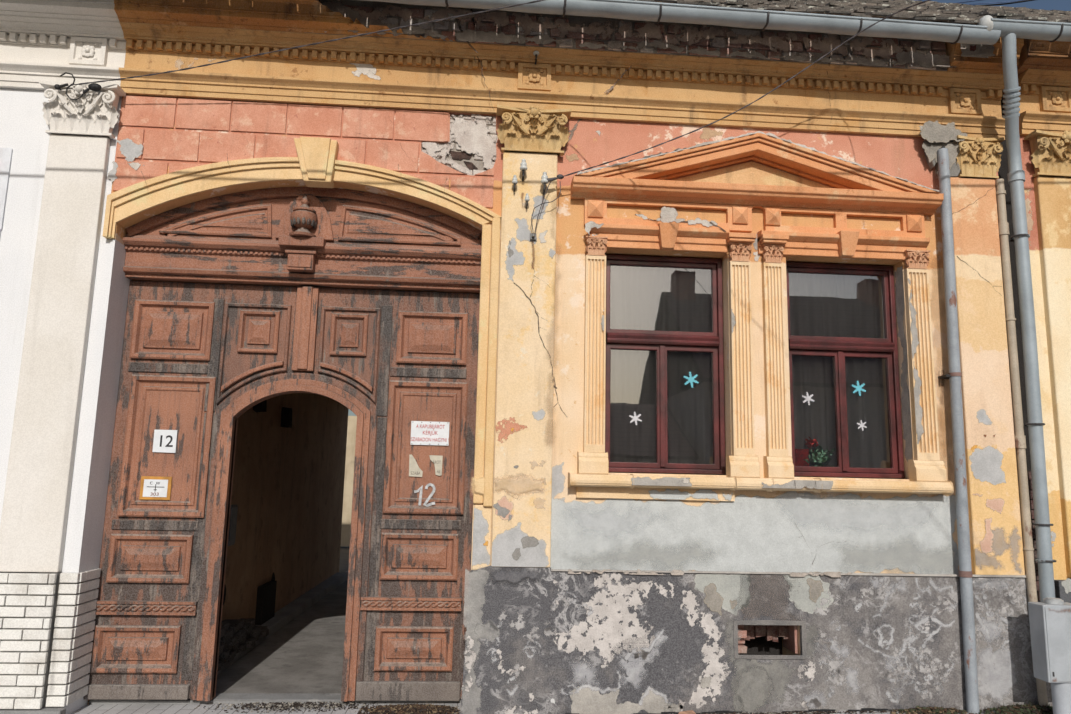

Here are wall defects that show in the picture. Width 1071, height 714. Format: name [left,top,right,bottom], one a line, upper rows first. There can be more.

spalling [304,0,995,71]
peeling [108,138,143,182]
spalling [422,114,498,176]
peeling [919,120,968,175]
peeling [505,196,556,281]
peeling [636,206,718,227]
crack [514,268,567,417]
peeling [969,409,1021,572]
flaking render [472,461,959,616]
peeling [569,671,683,714]